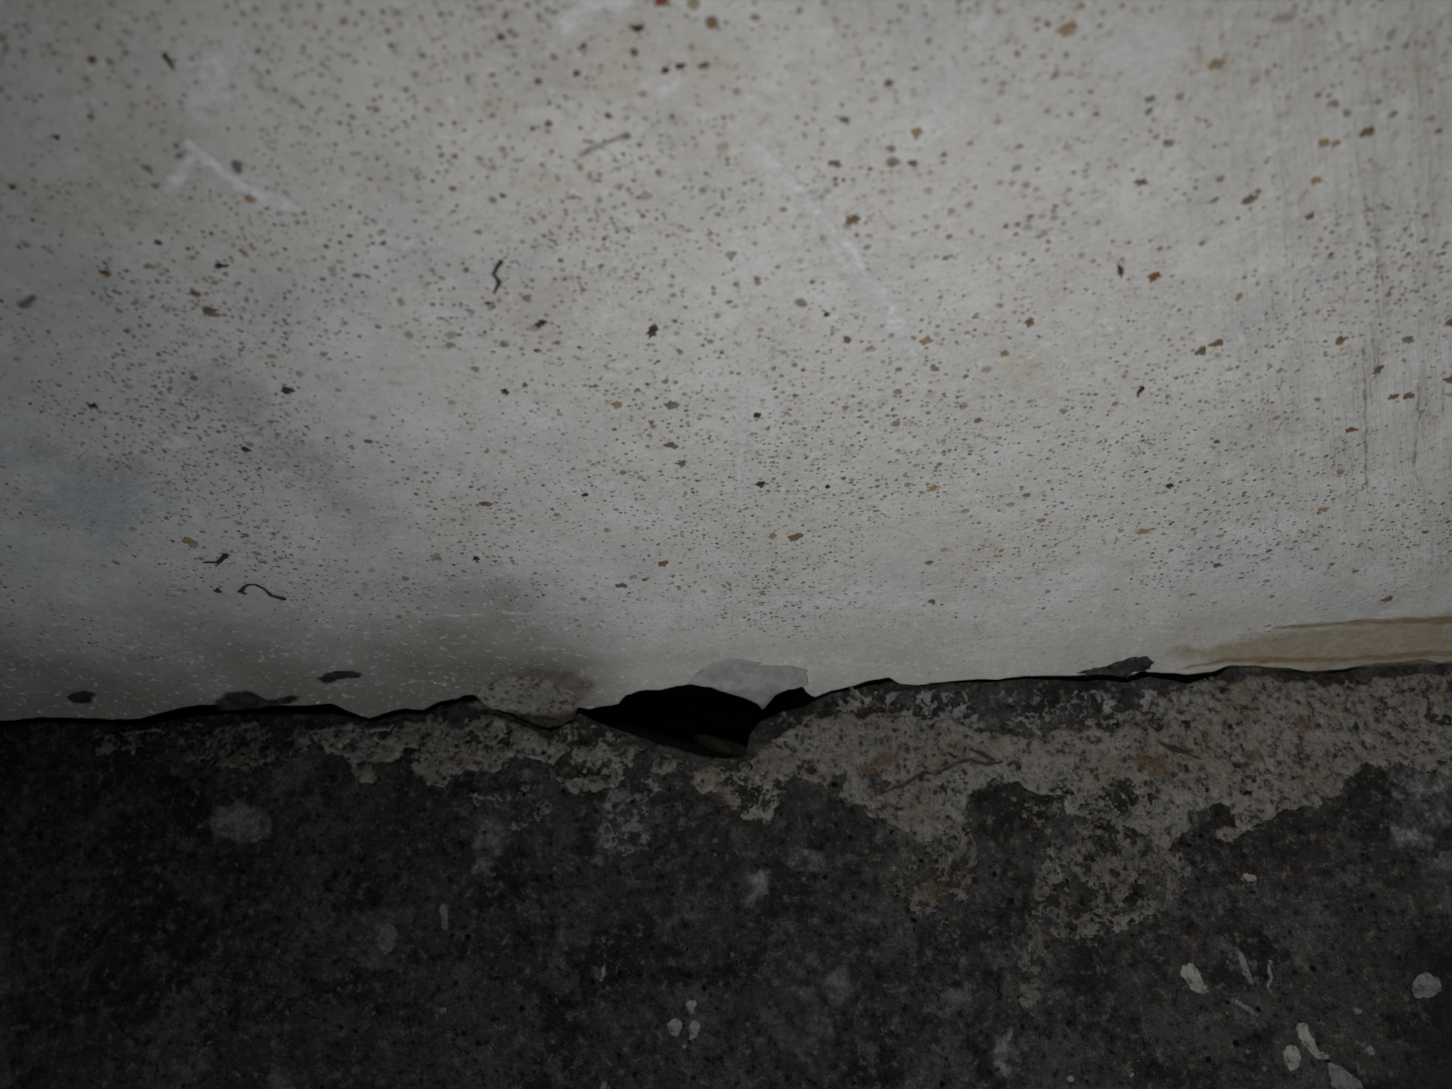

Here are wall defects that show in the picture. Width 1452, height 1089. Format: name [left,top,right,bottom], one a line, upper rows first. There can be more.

damp [1183,618,1452,667]
crack [800,659,1452,708]
crack [0,695,572,732]
spalling [94,656,1452,1016]